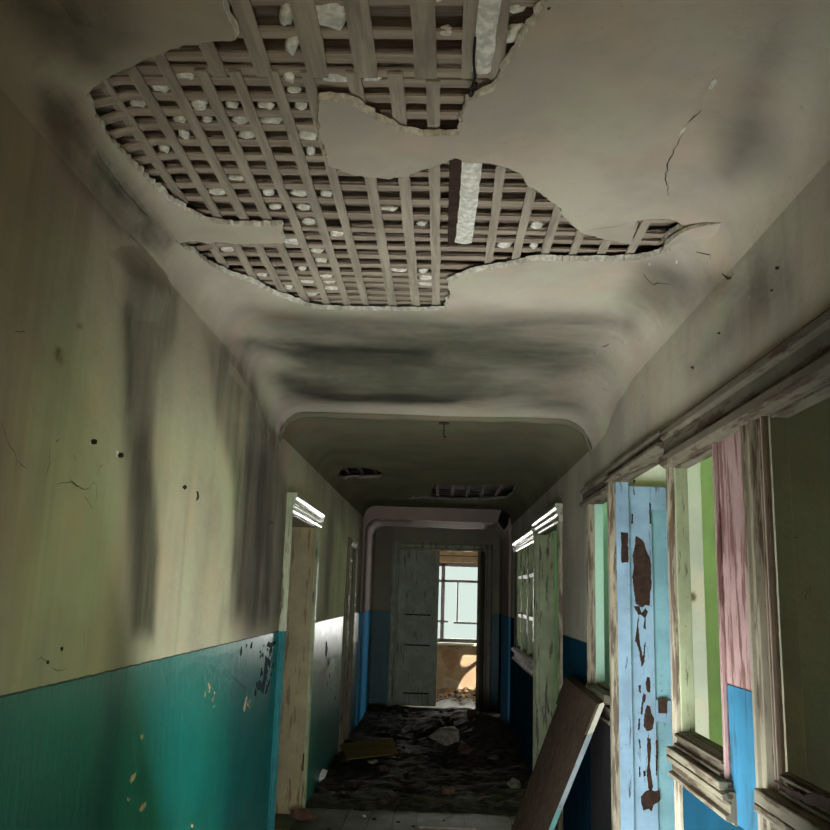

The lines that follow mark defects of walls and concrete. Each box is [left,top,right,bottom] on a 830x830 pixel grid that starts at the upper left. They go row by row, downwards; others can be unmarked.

flaking render [87,0,721,311]
crack [665,111,701,196]
peeling [632,536,652,667]
peeling [240,640,276,711]
peeling [638,677,660,811]